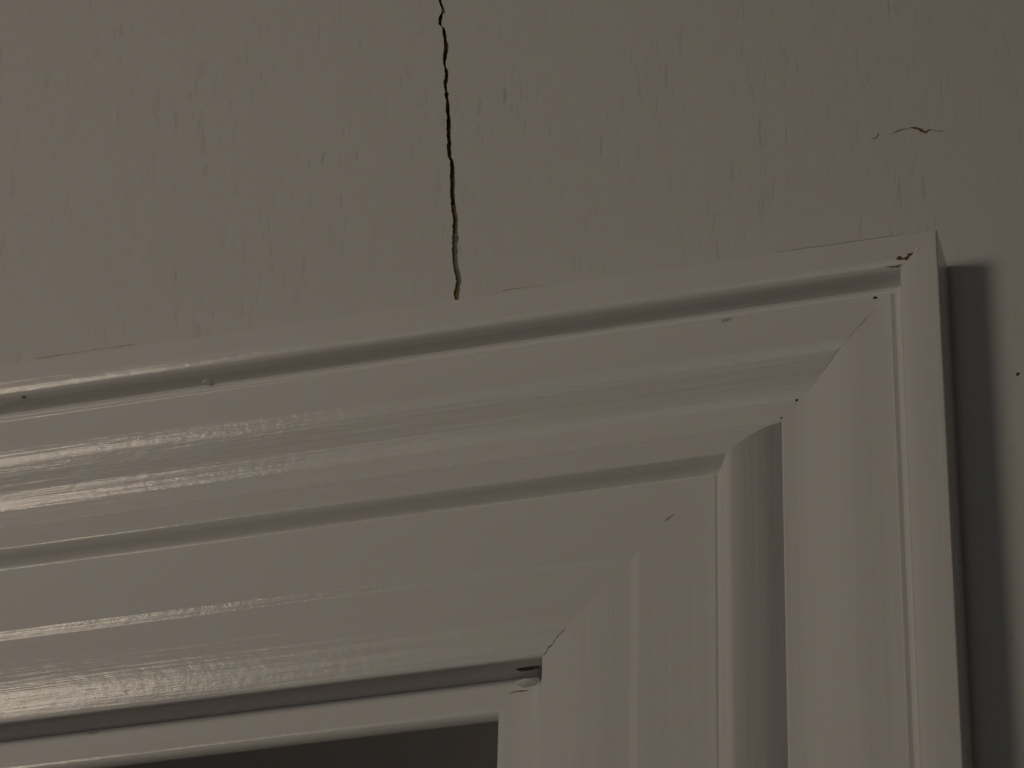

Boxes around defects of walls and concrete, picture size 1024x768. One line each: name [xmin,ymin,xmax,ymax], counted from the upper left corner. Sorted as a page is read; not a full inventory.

crack [438,0,461,300]
crack [872,127,941,139]